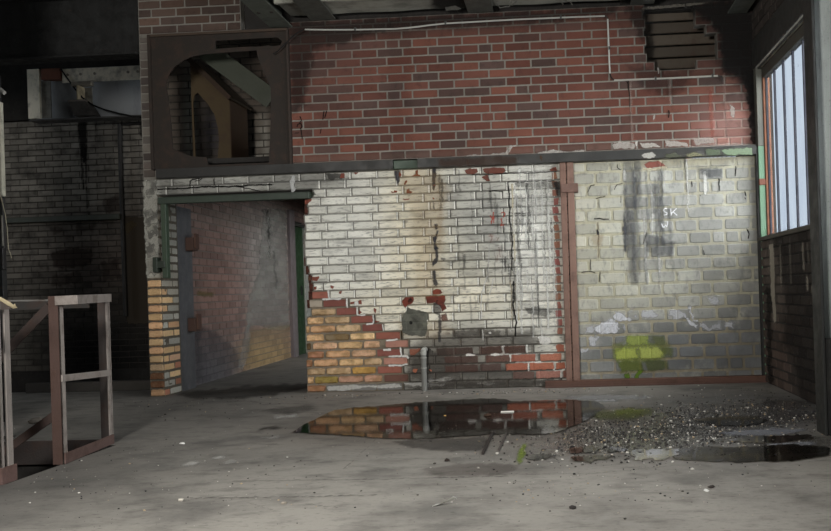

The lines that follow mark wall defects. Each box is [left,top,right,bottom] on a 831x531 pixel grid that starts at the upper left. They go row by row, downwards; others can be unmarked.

peeling [465,167,506,181]
spalling [304,257,566,393]
water stain [433,303,441,342]
crack [472,171,557,336]
water stain [491,345,541,371]
water stain [504,184,555,345]
peeling [549,167,563,334]